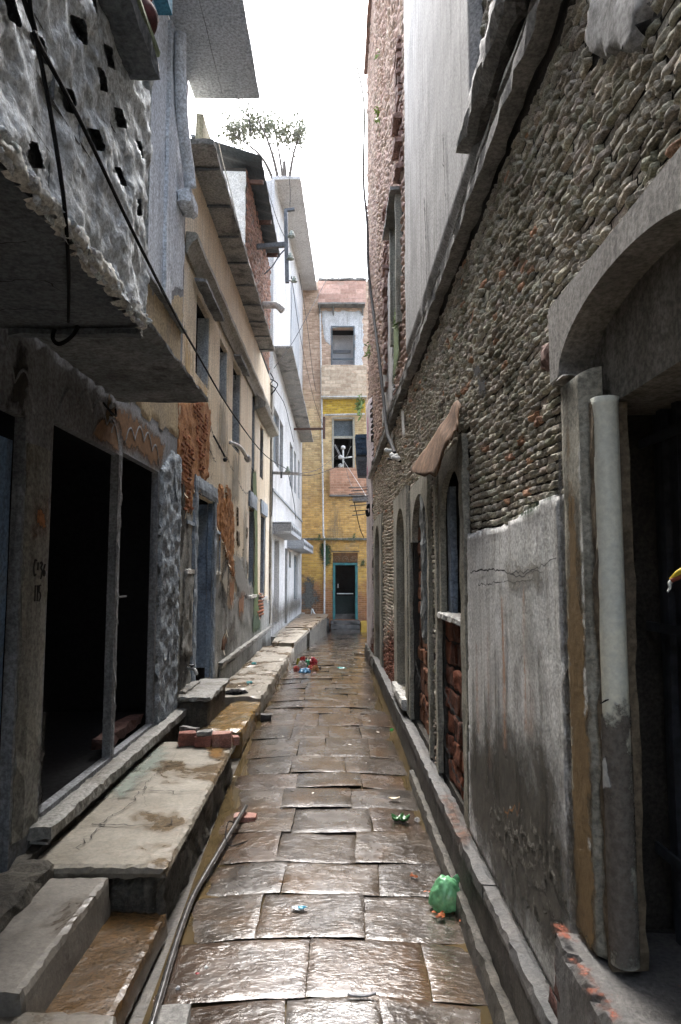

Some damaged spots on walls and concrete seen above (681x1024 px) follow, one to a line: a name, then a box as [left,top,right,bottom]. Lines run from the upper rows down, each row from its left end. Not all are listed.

flaking render [93,394,265,619]
crack [77,758,185,849]
water stain [467,484,596,956]